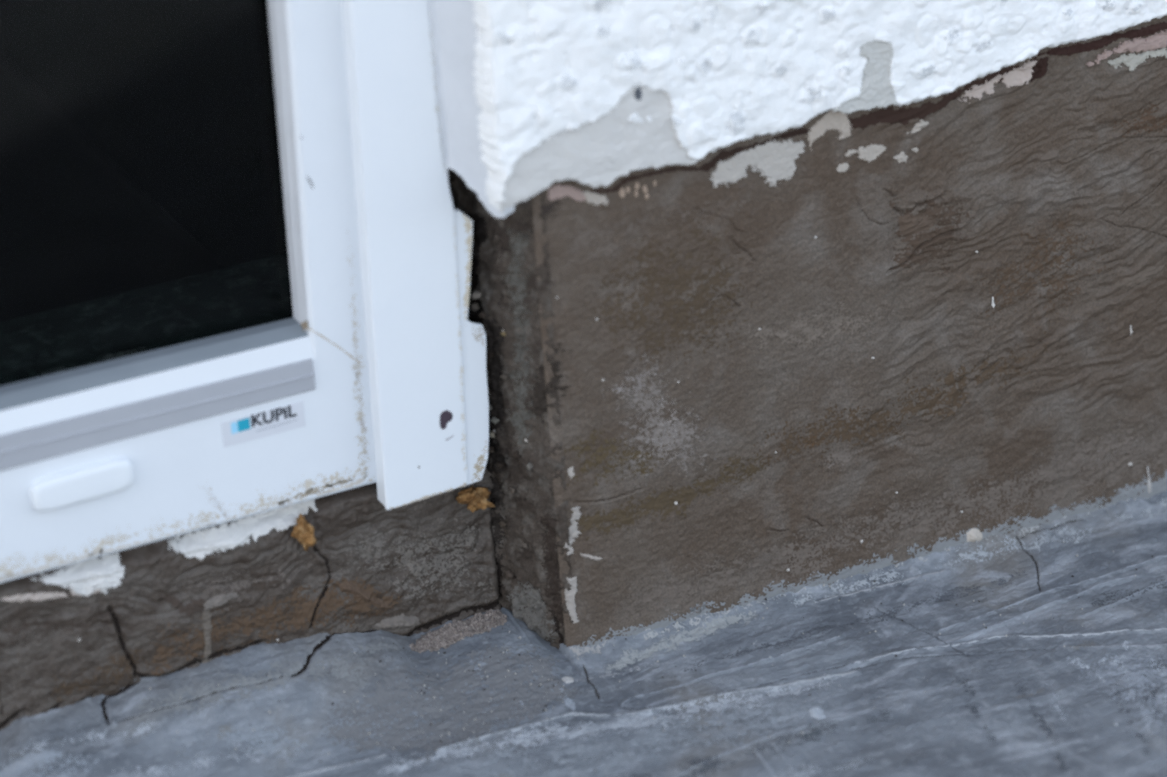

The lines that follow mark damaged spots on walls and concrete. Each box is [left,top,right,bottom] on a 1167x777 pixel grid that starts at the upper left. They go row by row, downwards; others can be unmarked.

peeling [957,60,1037,104]
peeling [1086,29,1167,71]
spalling [500,83,696,212]
peeling [709,109,919,188]
peeling [906,119,929,134]
crack [310,545,331,627]
crack [108,606,264,677]
crack [0,692,22,728]